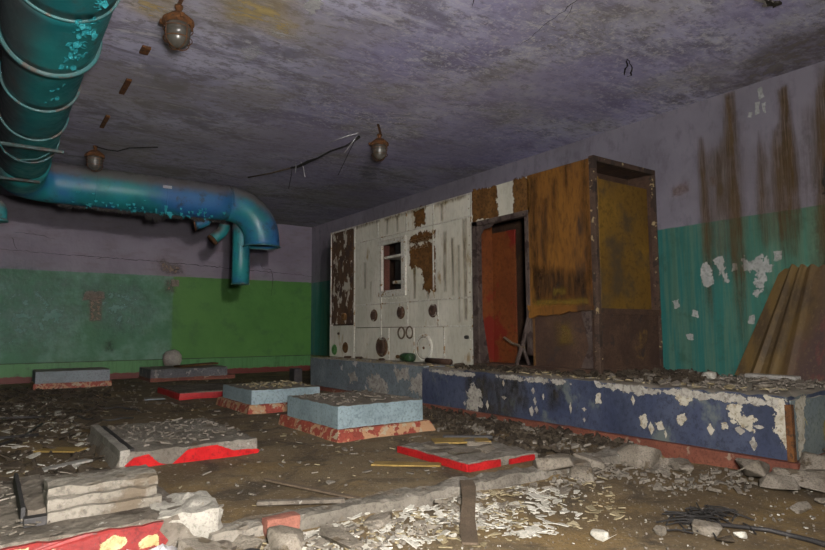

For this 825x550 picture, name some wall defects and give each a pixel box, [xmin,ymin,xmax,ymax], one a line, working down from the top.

spalling [754,0,782,8]
peeling [58,0,109,71]
peeling [700,251,782,298]
peeling [394,366,489,412]
spalling [496,374,572,416]
spalling [594,380,807,457]